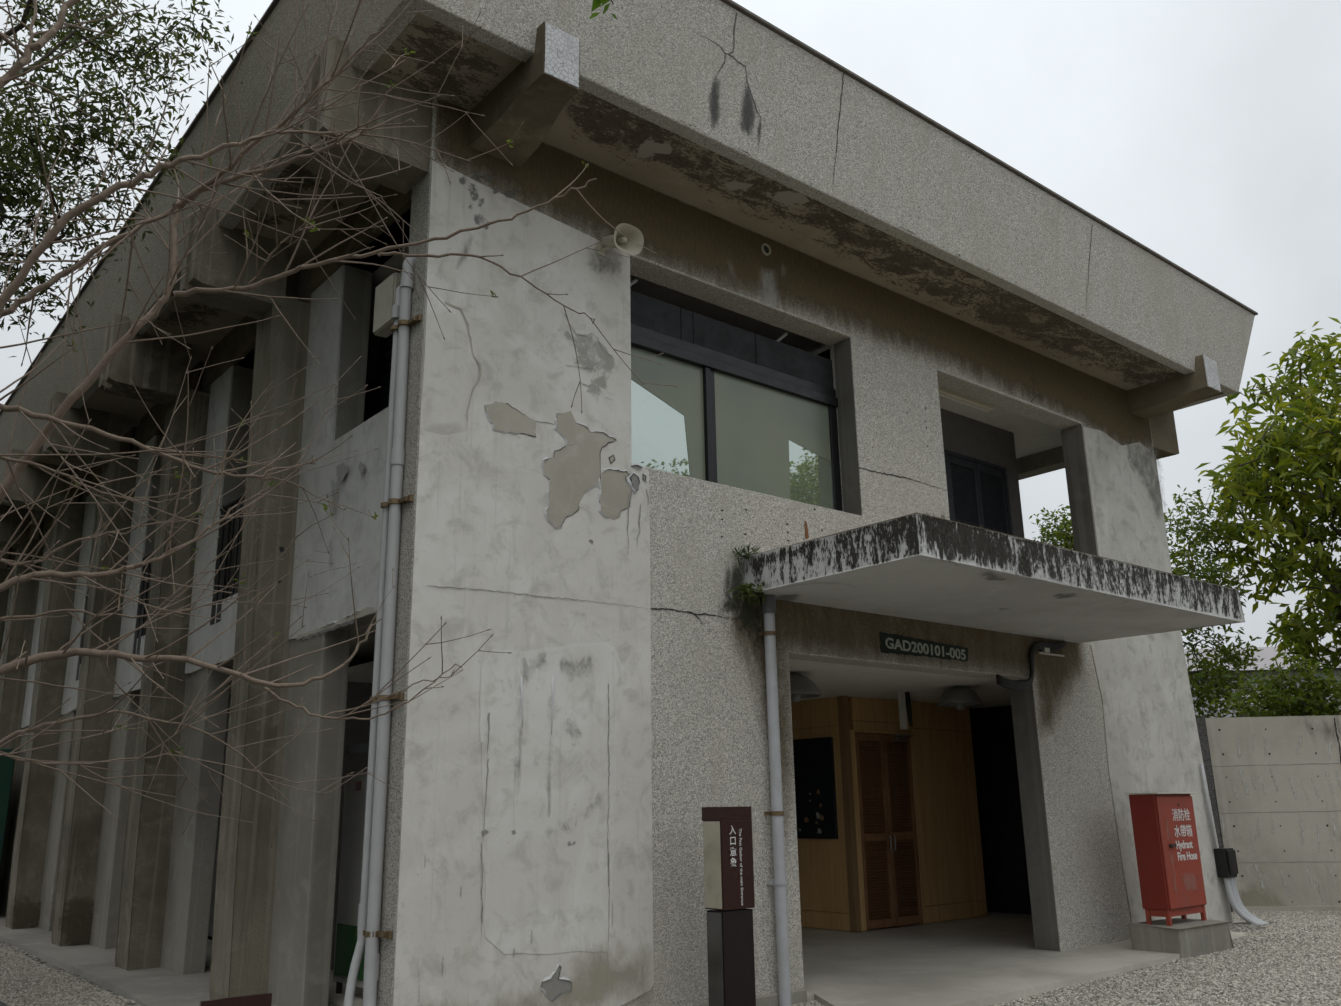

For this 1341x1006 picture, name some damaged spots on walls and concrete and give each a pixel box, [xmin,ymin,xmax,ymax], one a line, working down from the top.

crack [702,12,762,137]
crack [833,74,844,180]
damp [374,21,1182,448]
peeling [484,401,647,530]
damp [735,513,1242,724]
damp [779,698,788,770]
peeling [541,962,572,1002]